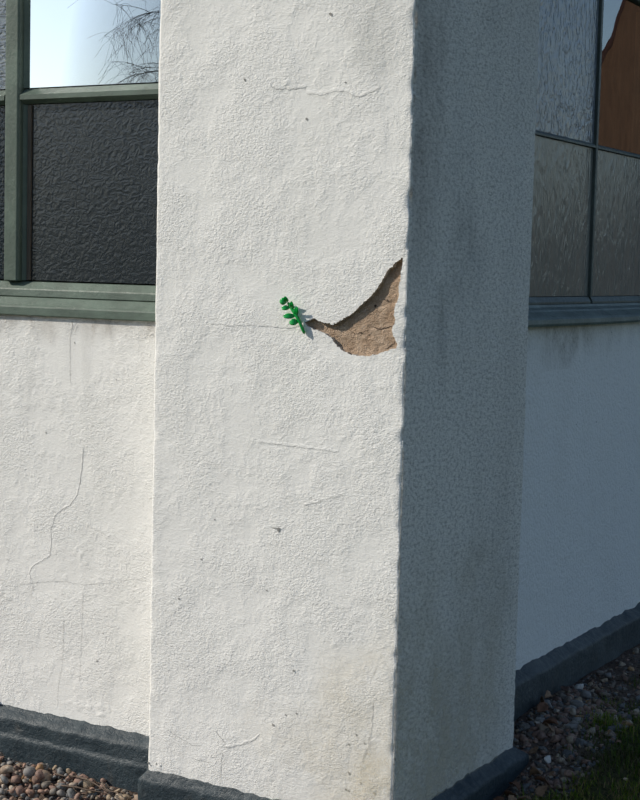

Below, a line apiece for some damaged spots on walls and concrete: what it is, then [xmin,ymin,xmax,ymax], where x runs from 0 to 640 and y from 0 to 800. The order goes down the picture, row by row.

flaking render [305,258,403,356]
crack [11,445,144,705]